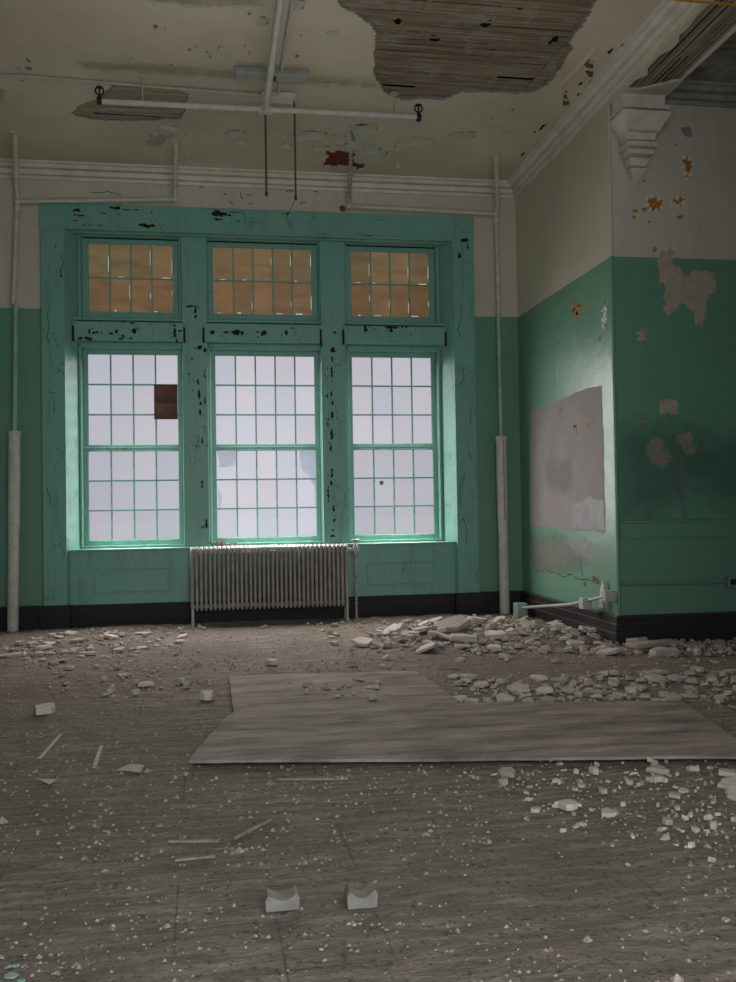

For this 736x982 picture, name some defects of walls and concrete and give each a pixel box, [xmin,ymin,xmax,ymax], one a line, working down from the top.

flaking render [608,0,714,105]
spalling [559,58,597,109]
spalling [72,204,155,228]
spalling [211,209,260,224]
spalling [632,194,686,223]
peeling [653,246,718,329]
flaking render [530,386,606,534]